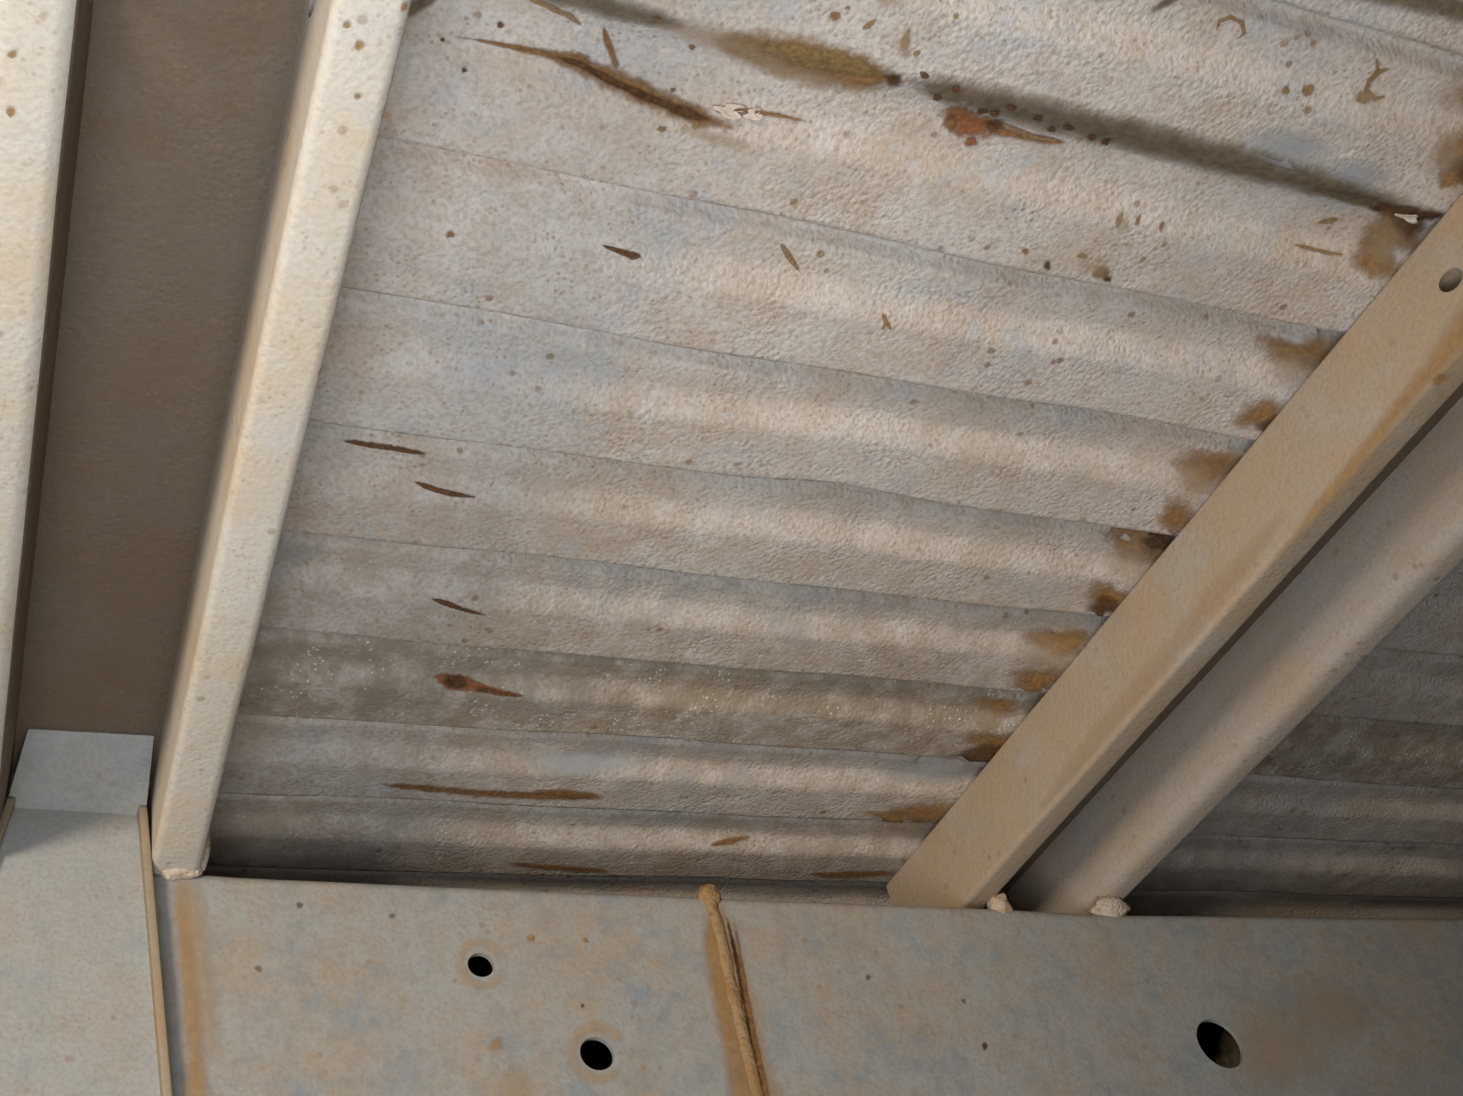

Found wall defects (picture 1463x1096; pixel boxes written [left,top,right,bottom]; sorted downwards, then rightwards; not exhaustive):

rust [944,107,1063,146]
rust [1440,137,1463,187]
rust [1356,211,1422,275]
rust [1116,504,1190,561]
rust [1090,585,1127,616]
rust [434,674,521,697]
rust [981,632,1082,716]
rust [959,735,1007,762]
rust [389,784,599,800]
rust [711,836,748,846]
rust [514,863,607,872]
rust [709,931,769,1096]